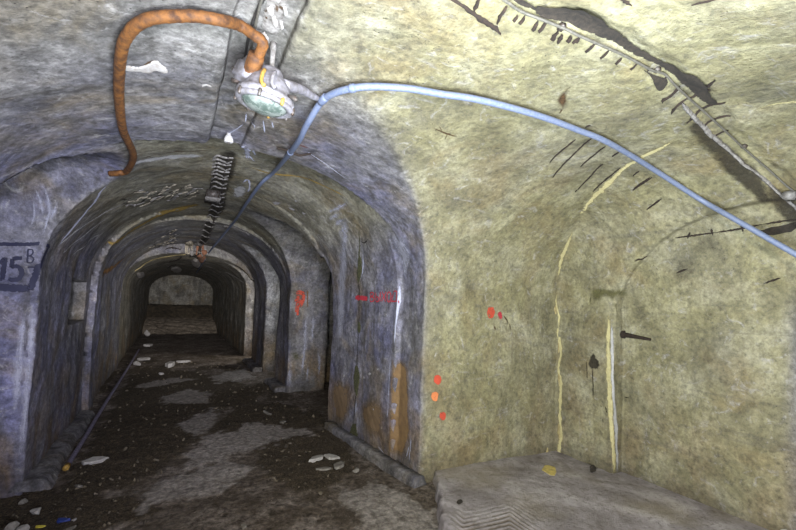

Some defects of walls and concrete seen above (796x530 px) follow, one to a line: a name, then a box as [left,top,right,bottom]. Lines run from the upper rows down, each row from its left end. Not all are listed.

corrosion [363,363,409,453]